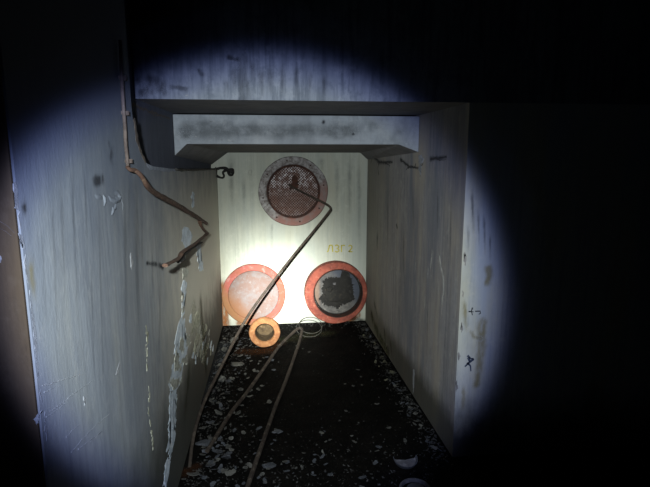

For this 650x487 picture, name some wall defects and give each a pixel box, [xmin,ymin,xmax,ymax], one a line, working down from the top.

peeling [181,227,203,271]
peeling [163,268,214,487]